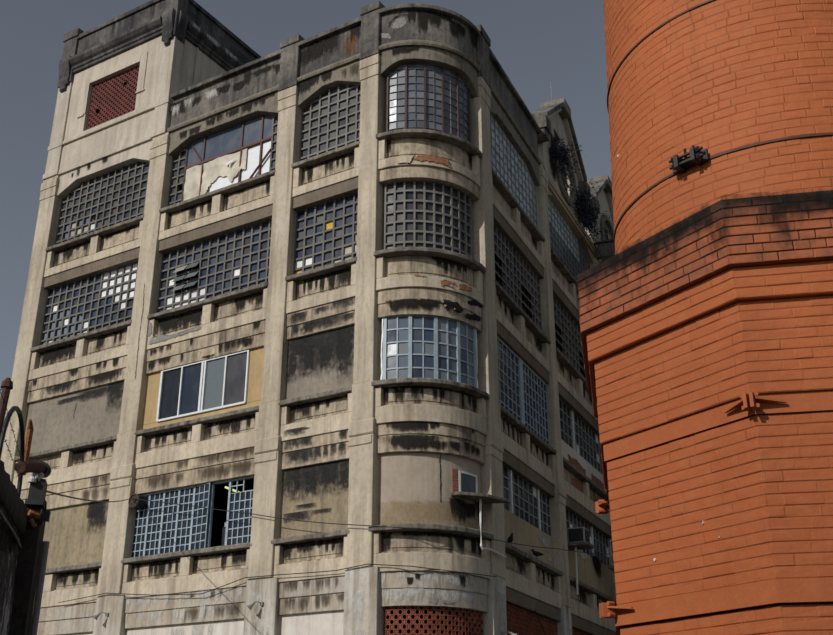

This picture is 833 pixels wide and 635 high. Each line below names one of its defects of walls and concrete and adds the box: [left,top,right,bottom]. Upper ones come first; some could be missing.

water stain [408,10,477,47]
water stain [392,46,420,55]
water stain [169,64,280,114]
water stain [180,92,275,138]
water stain [386,298,451,312]
spalling [440,279,482,321]
water stain [287,297,354,380]
water stain [386,422,480,455]
water stain [284,430,349,522]